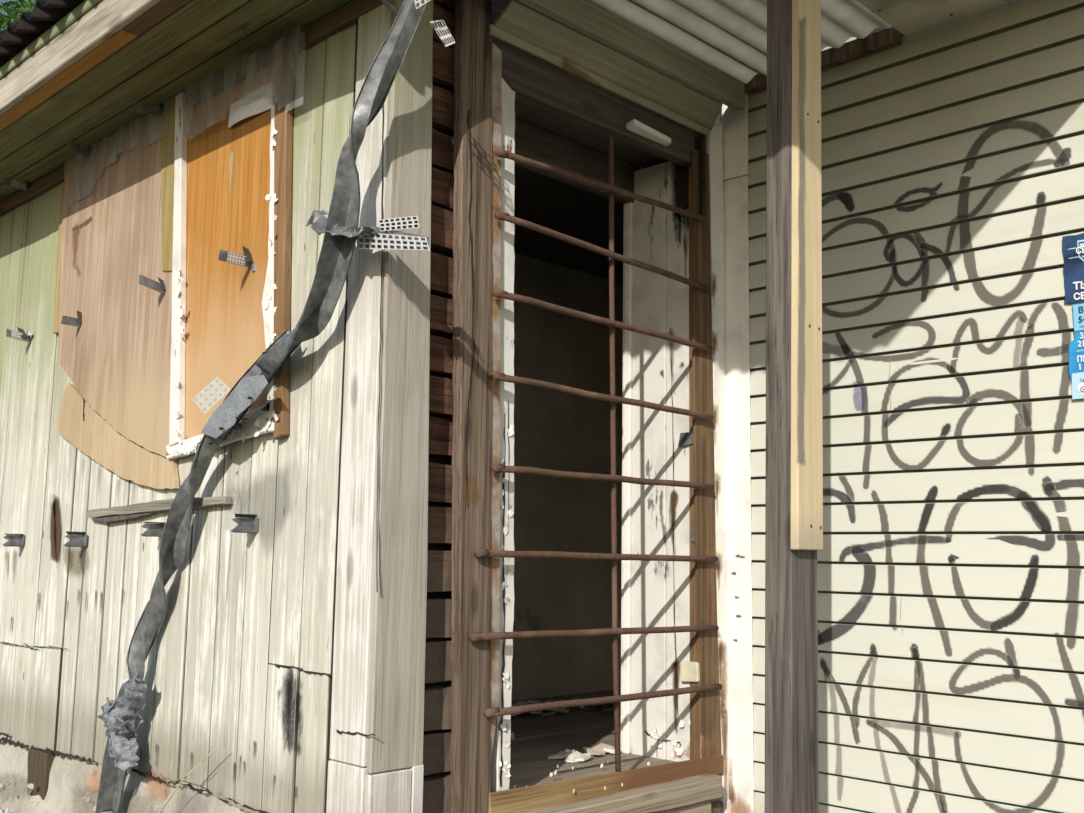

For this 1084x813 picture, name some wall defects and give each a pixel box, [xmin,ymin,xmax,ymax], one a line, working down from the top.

leakage [672,135,706,275]
peeling [262,284,278,352]
peeling [175,410,200,455]
peeling [226,413,279,442]
peeling [498,402,514,787]
crack [0,642,67,650]
crack [275,664,333,676]
leakage [278,669,301,753]
crack [336,729,375,737]
corrosion [719,644,749,813]
flaking render [72,769,167,813]
crack [131,769,269,813]